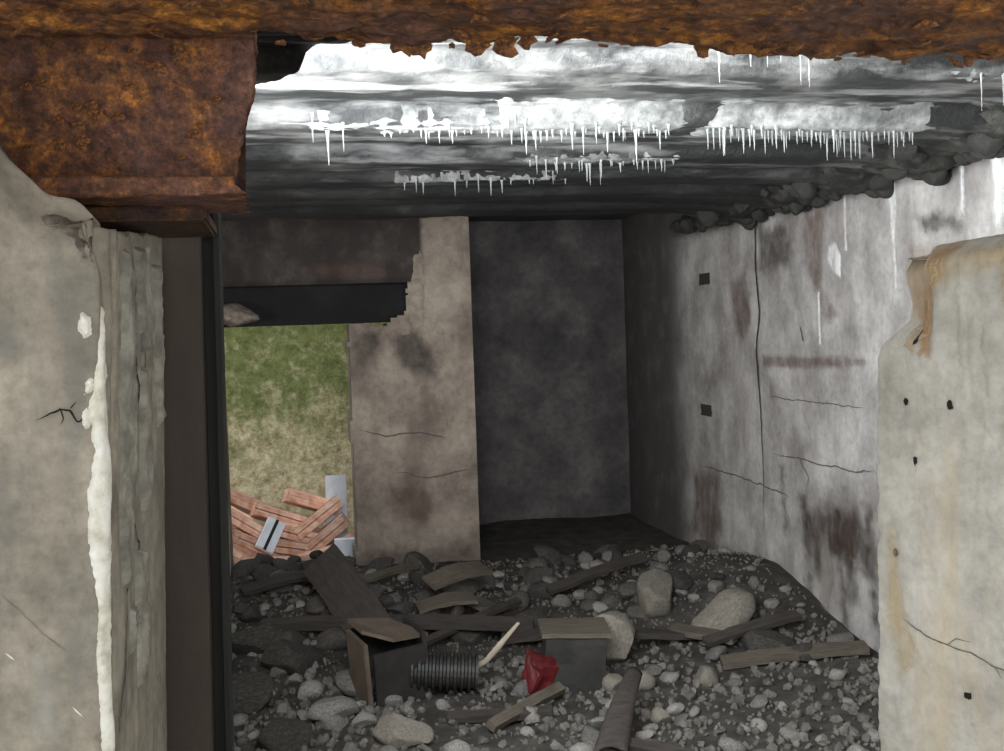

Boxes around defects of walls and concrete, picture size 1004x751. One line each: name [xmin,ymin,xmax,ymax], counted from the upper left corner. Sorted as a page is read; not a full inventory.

corrosion [307,30,366,48]
corrosion [385,13,570,60]
corrosion [693,45,710,59]
corrosion [754,42,778,58]
corrosion [833,50,884,61]
spalling [669,104,1004,234]
spalling [391,251,426,337]
crack [703,226,869,497]
crack [37,402,82,423]
damp [78,307,115,751]
damp [805,510,868,583]
crack [901,618,1004,679]